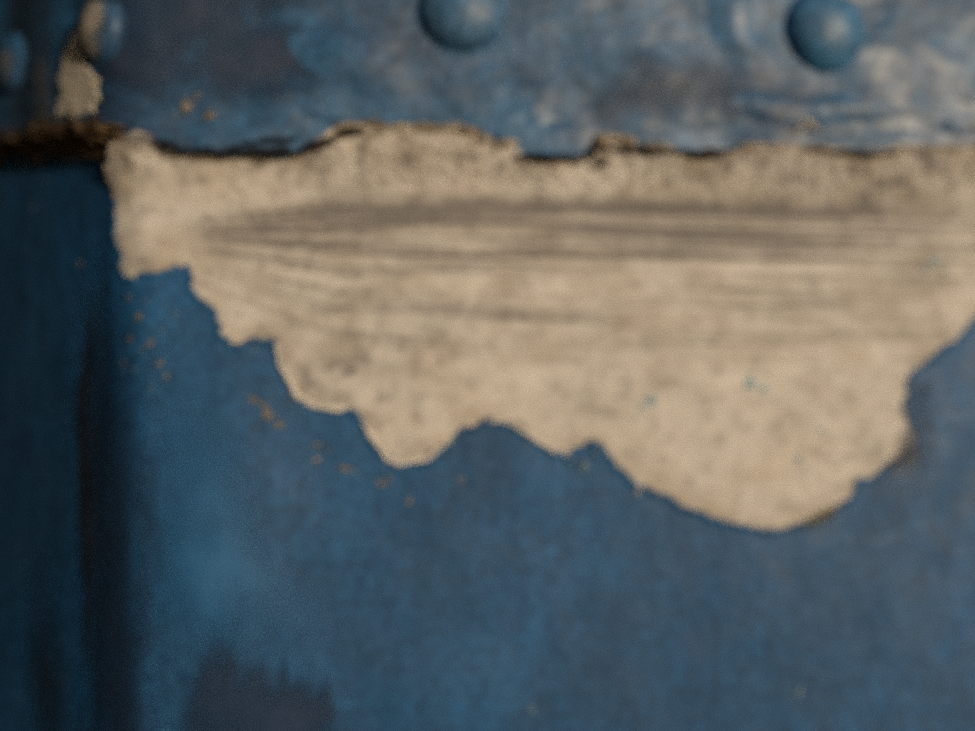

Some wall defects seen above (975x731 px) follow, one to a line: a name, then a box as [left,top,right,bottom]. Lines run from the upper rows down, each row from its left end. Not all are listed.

peeling [55,0,102,121]
peeling [103,119,975,536]
water stain [187,654,334,731]